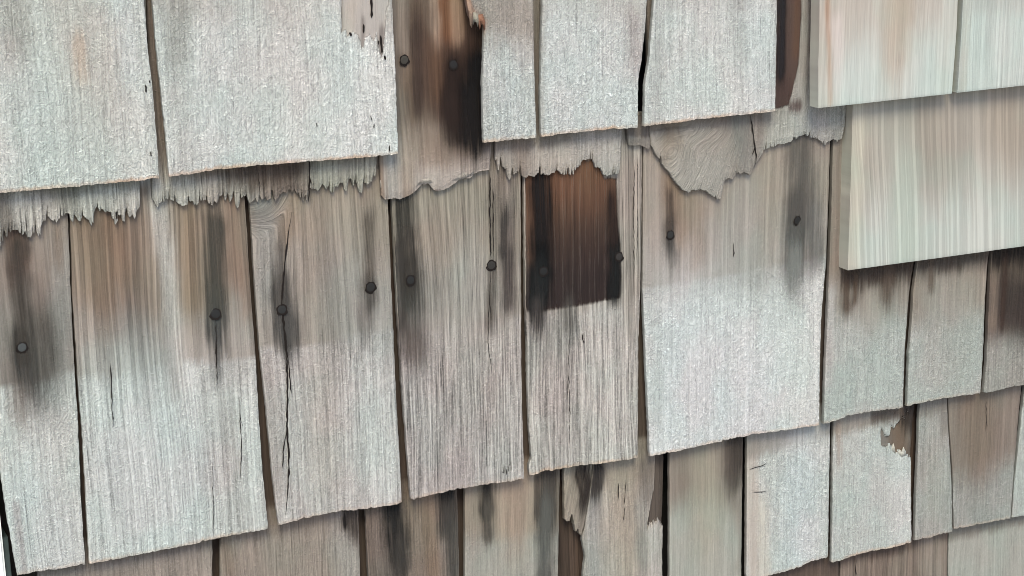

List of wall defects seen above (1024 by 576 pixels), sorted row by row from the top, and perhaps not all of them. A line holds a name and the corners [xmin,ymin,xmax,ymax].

damp [441,45,488,162]
damp [11,236,54,402]
crack [281,161,311,518]
damp [525,159,621,328]
damp [786,134,819,282]
spalling [881,412,912,457]